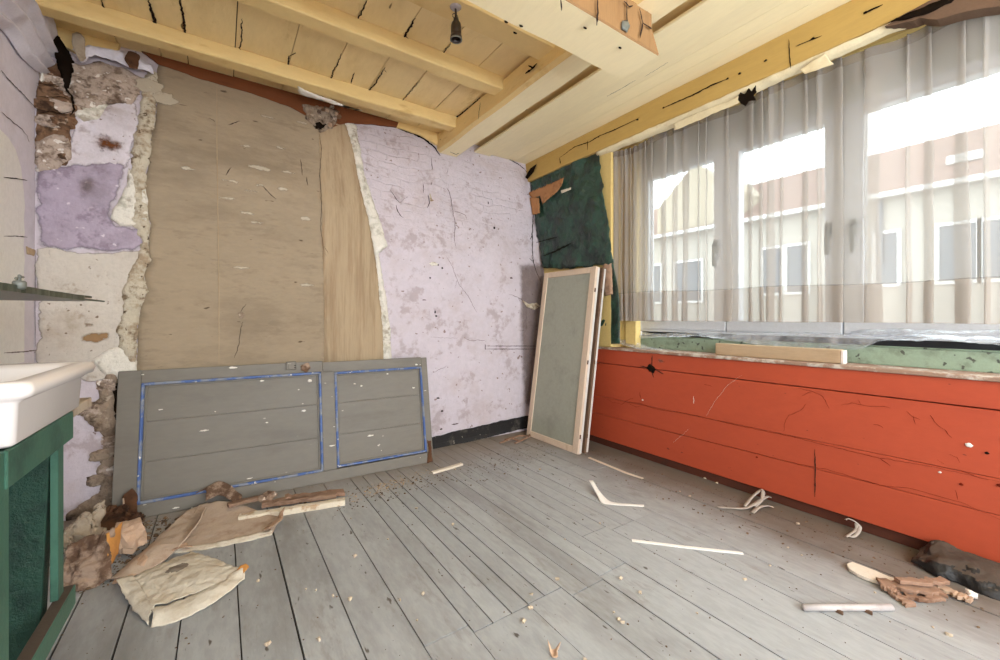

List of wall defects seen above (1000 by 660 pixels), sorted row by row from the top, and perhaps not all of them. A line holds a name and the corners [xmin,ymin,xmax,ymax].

crack [148,1,157,23]
crack [178,0,186,33]
spalling [885,0,1000,32]
crack [331,55,386,90]
flaking render [302,104,392,359]
flaking render [26,61,158,487]
crack [618,388,1000,520]